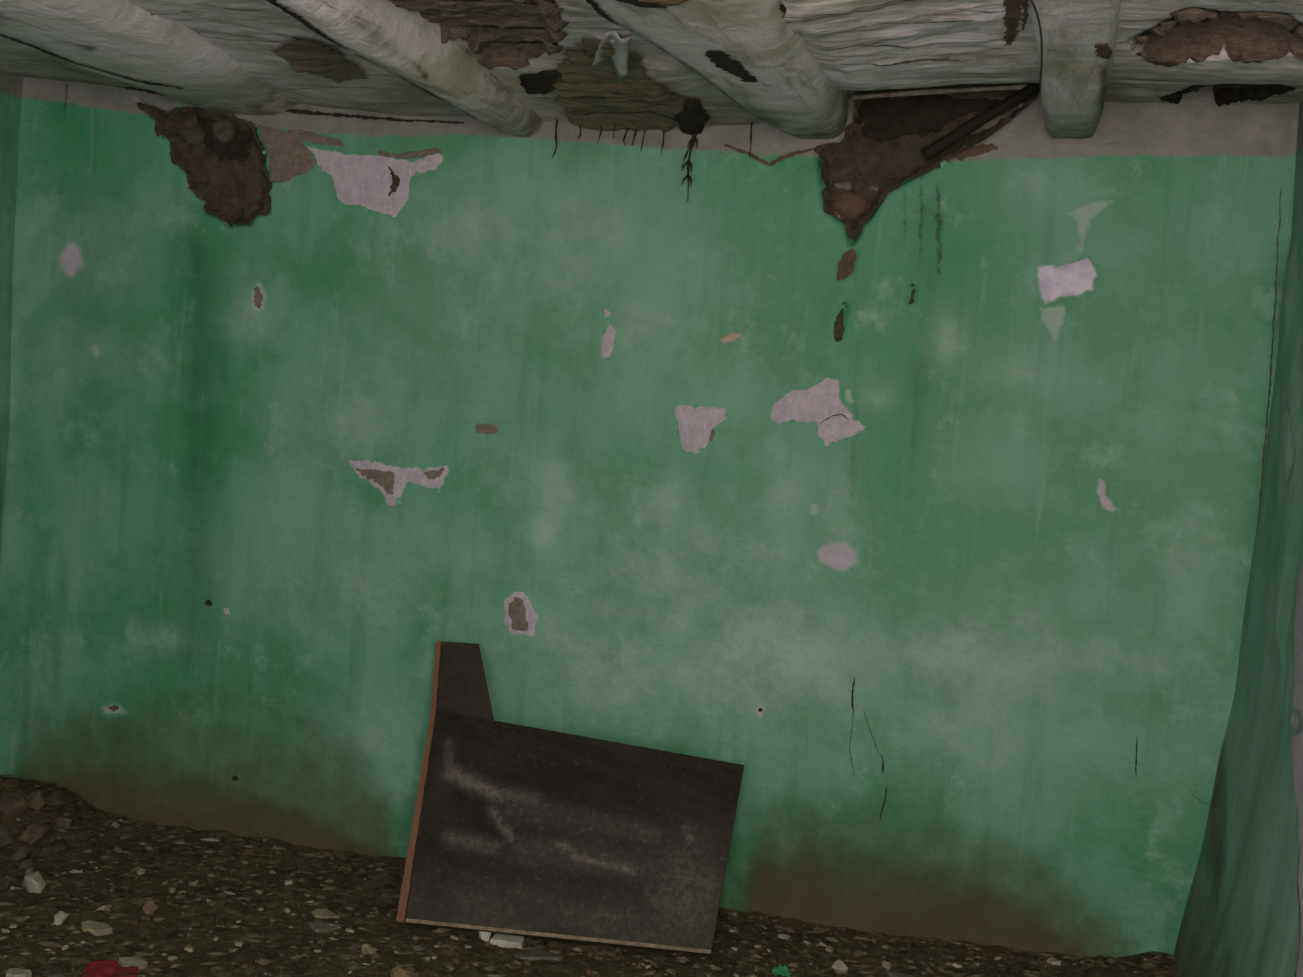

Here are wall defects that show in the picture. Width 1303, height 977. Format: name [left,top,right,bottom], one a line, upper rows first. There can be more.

crack [0,34,182,98]
crack [265,0,478,124]
flaking render [1135,7,1303,67]
flaking render [136,102,444,226]
flaking render [724,83,1038,281]
peeling [1035,191,1127,351]
peeling [348,459,449,506]
peeling [675,405,729,453]
peeling [771,375,865,447]
flaking render [504,592,539,637]
leakage [22,727,386,857]
leakage [746,834,1104,957]